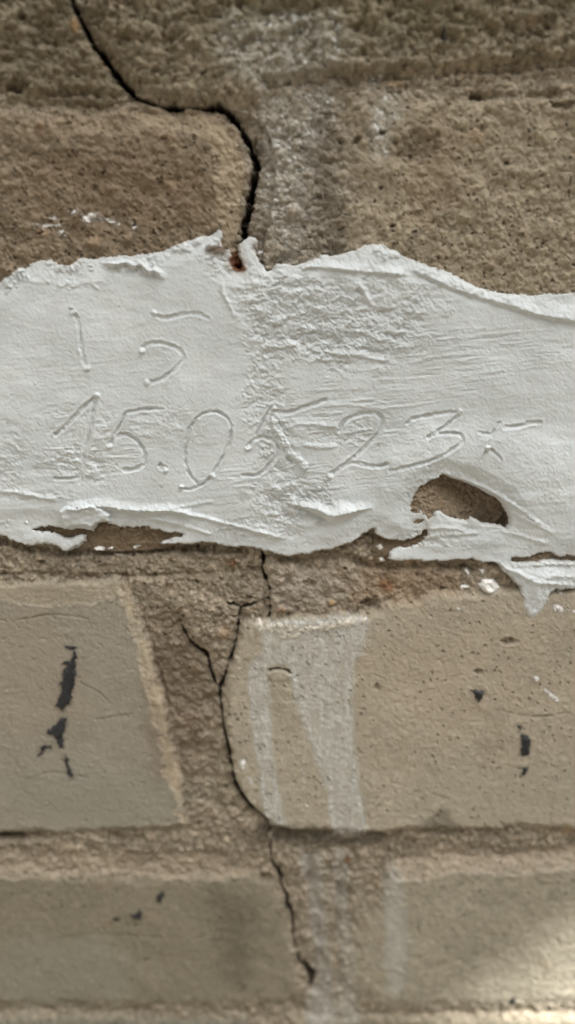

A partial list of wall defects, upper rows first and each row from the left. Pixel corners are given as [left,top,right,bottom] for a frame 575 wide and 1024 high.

crack [65,0,263,253]
spalling [35,505,182,551]
spalling [371,475,509,562]
crack [177,550,316,990]